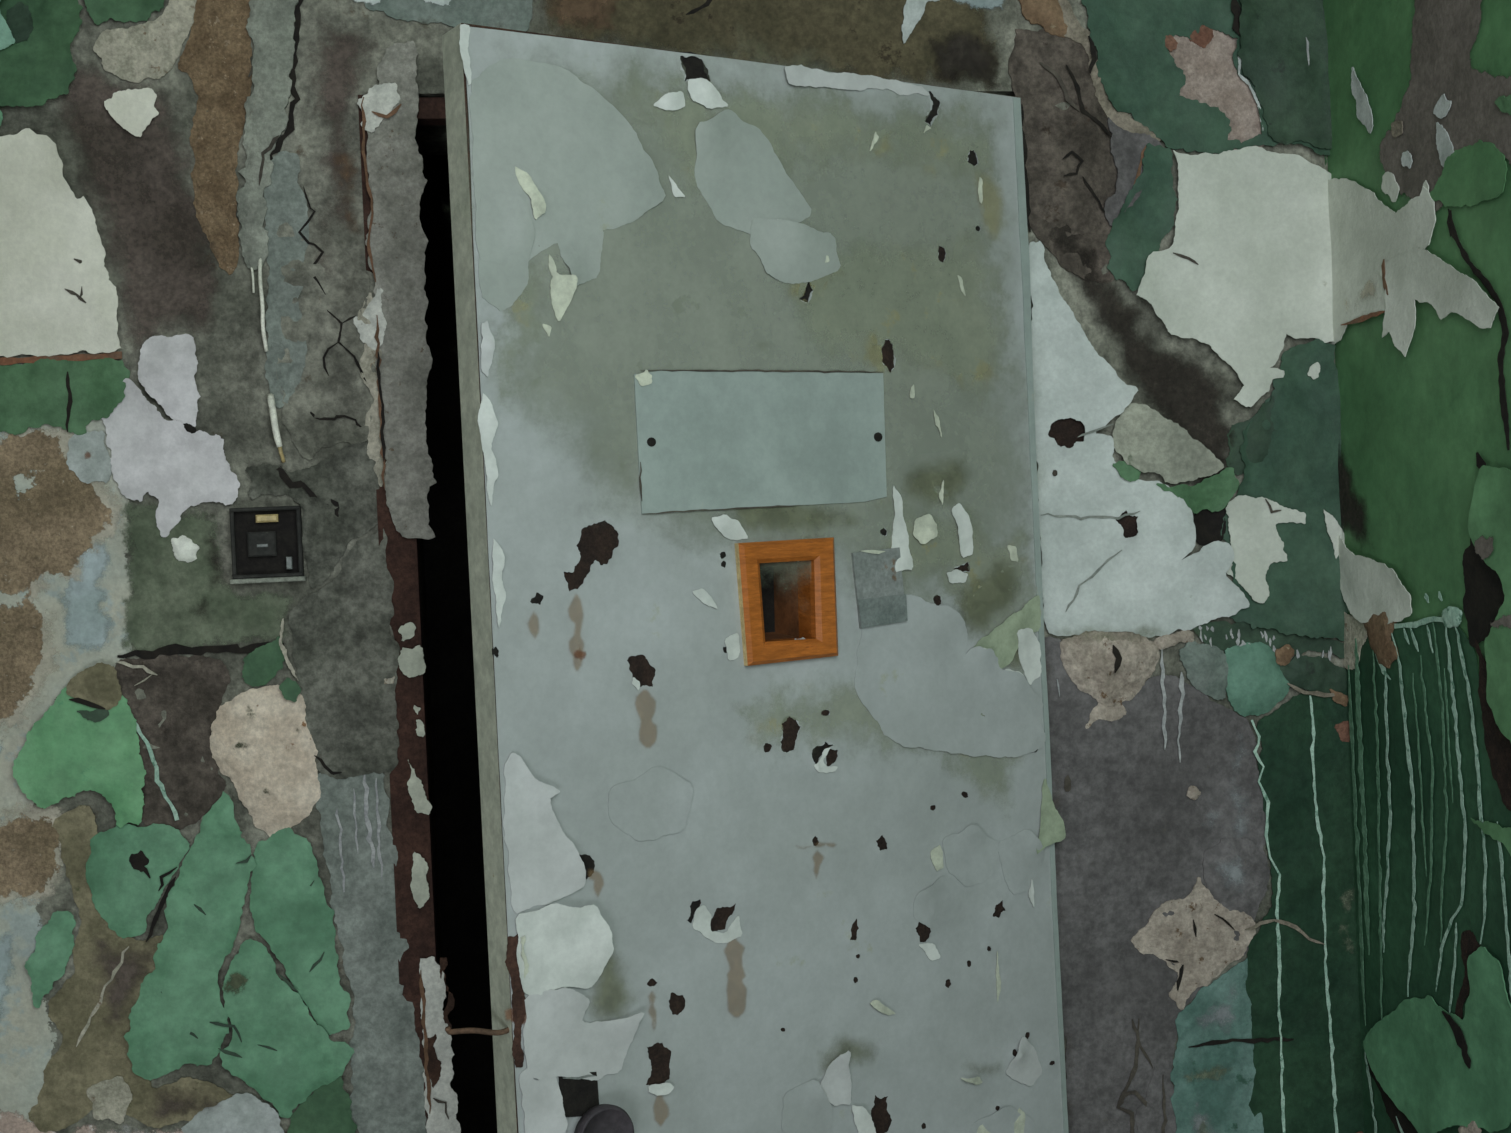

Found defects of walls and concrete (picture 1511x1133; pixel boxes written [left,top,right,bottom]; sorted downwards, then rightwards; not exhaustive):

crack [259,0,303,186]
leakage [545,0,998,86]
peeling [0,0,437,719]
crack [298,186,386,462]
leakage [1055,224,1231,482]
crack [1448,209,1510,469]
corrosion [564,520,619,591]
flaking render [1008,0,1511,1133]
crack [1462,538,1511,811]
peeling [0,636,461,1133]